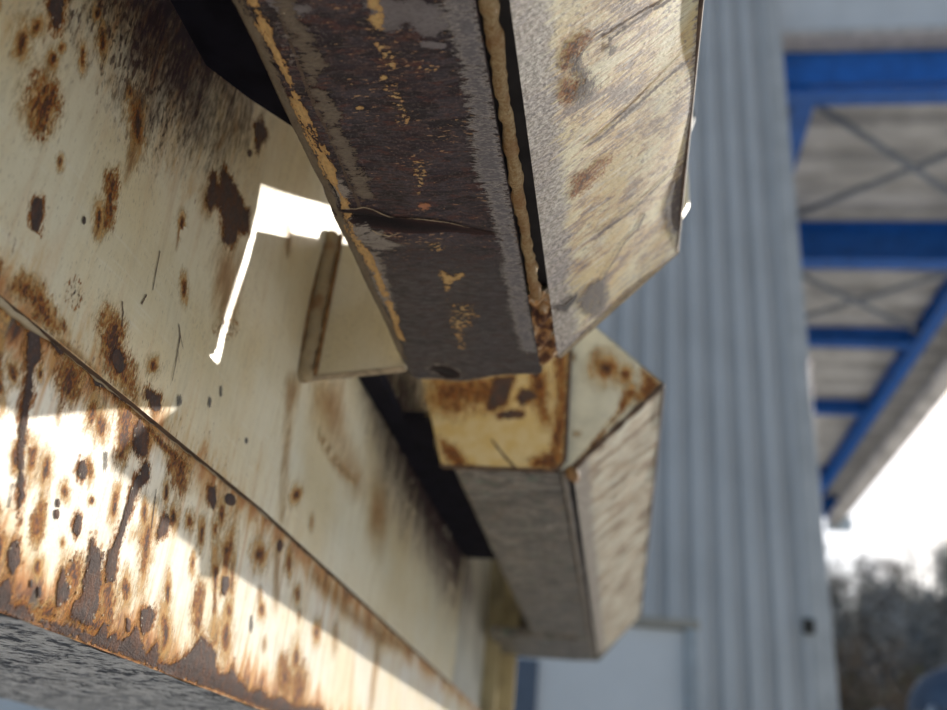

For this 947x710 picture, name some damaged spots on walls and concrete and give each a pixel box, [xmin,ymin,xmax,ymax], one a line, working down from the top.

corrosion [21,41,67,142]
corrosion [26,194,46,239]
corrosion [91,80,148,242]
peeling [204,162,252,252]
peeling [232,0,408,360]
crack [328,180,507,237]
peeling [362,0,537,353]
corrosion [528,354,575,468]
corrosion [580,350,660,458]
corrosion [0,268,239,667]
corrosion [249,536,301,621]
corrosion [276,636,309,708]